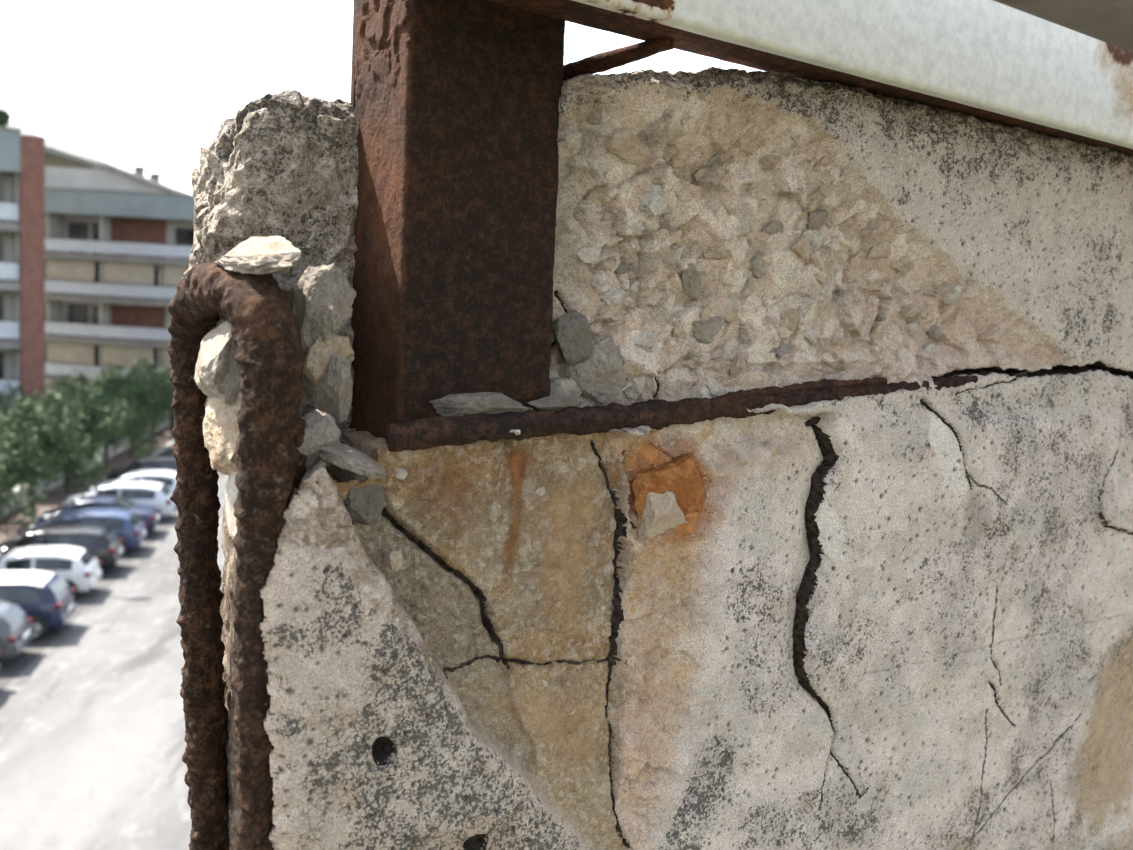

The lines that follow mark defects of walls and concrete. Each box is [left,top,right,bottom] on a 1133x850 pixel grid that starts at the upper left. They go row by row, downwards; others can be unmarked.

corrosion [1104,43,1133,110]
spalling [548,67,1073,413]
corrosion [290,418,307,498]
corrosion [627,440,710,506]
corrosion [726,377,888,395]
spalling [929,412,966,496]
crack [920,361,1133,504]
crack [1096,449,1133,535]
crack [382,440,671,848]
spalling [260,395,870,850]
crack [793,425,869,809]
leakage [1075,634,1133,824]